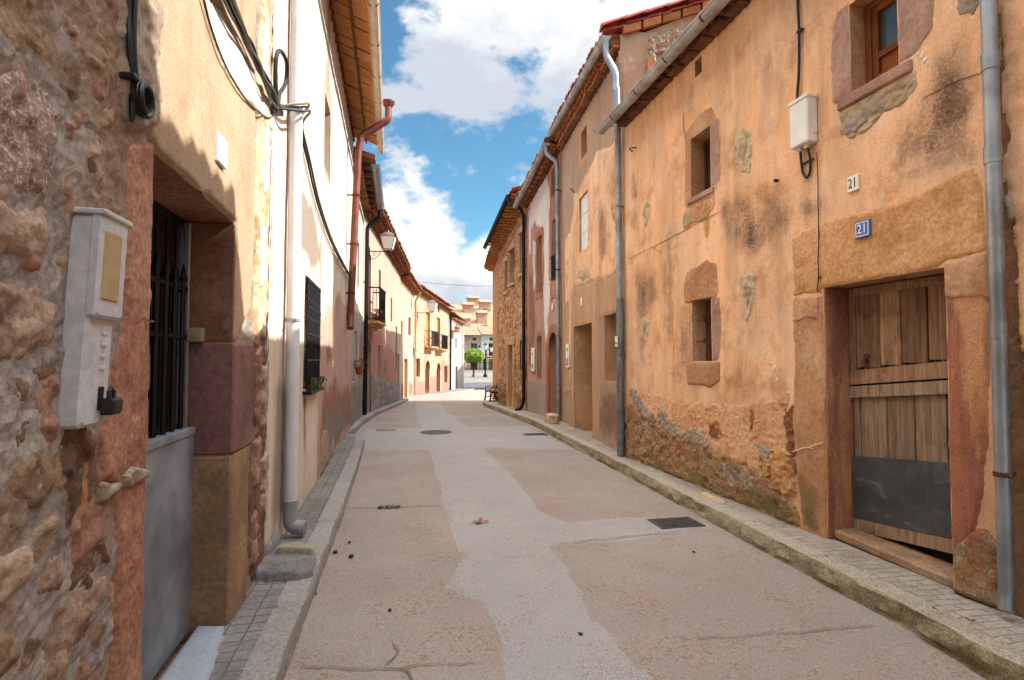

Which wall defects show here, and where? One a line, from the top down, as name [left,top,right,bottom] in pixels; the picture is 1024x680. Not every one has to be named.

spalling [839,51,929,139]
spalling [734,129,752,174]
spalling [740,273,759,322]
spalling [624,388,801,527]